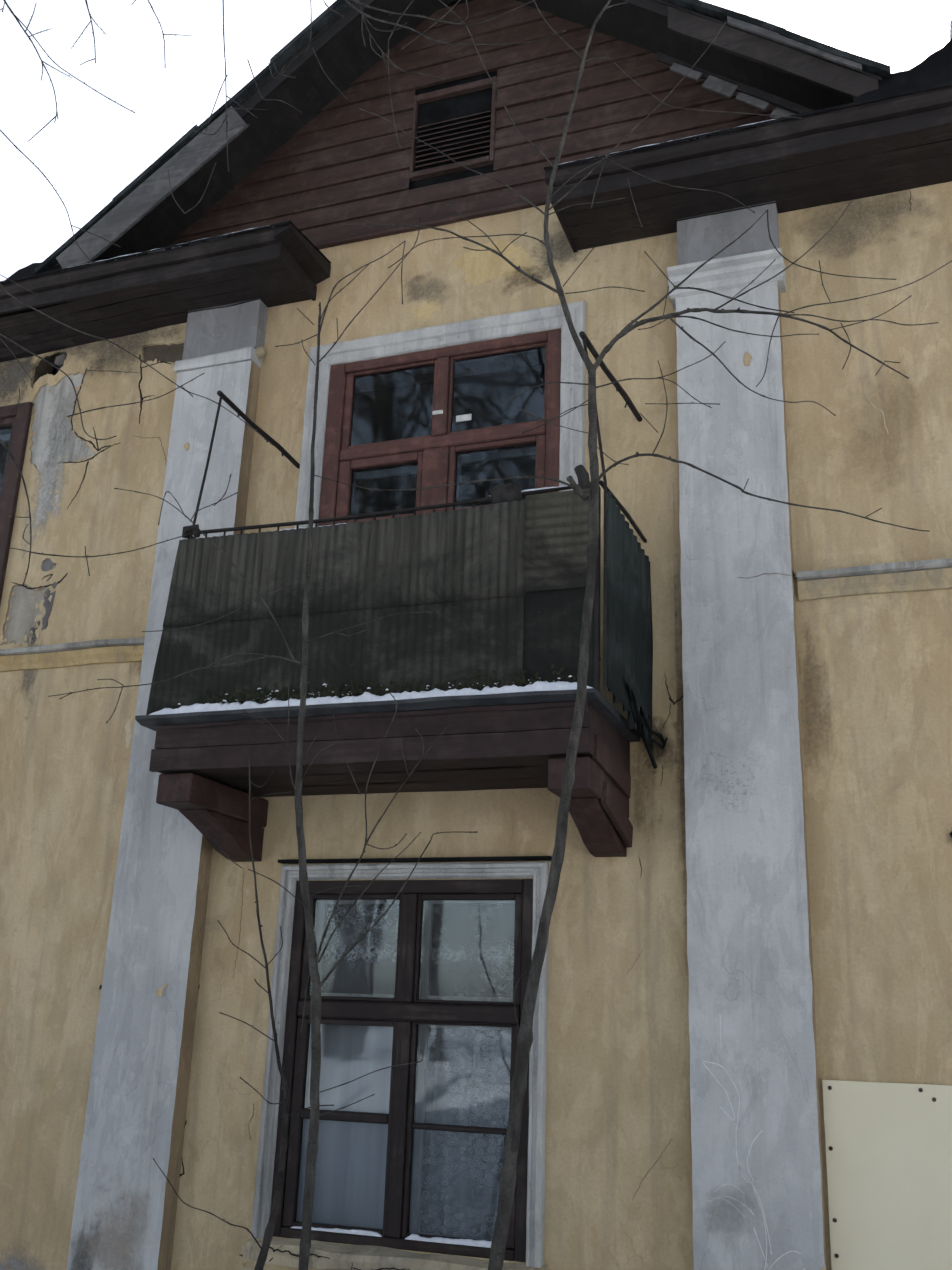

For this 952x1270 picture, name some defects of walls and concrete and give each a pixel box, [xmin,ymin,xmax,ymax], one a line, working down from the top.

peeling [28,352,96,512]
crack [60,355,175,509]
spalling [0,557,57,647]
damp [72,1202,137,1270]
crack [239,1247,410,1270]